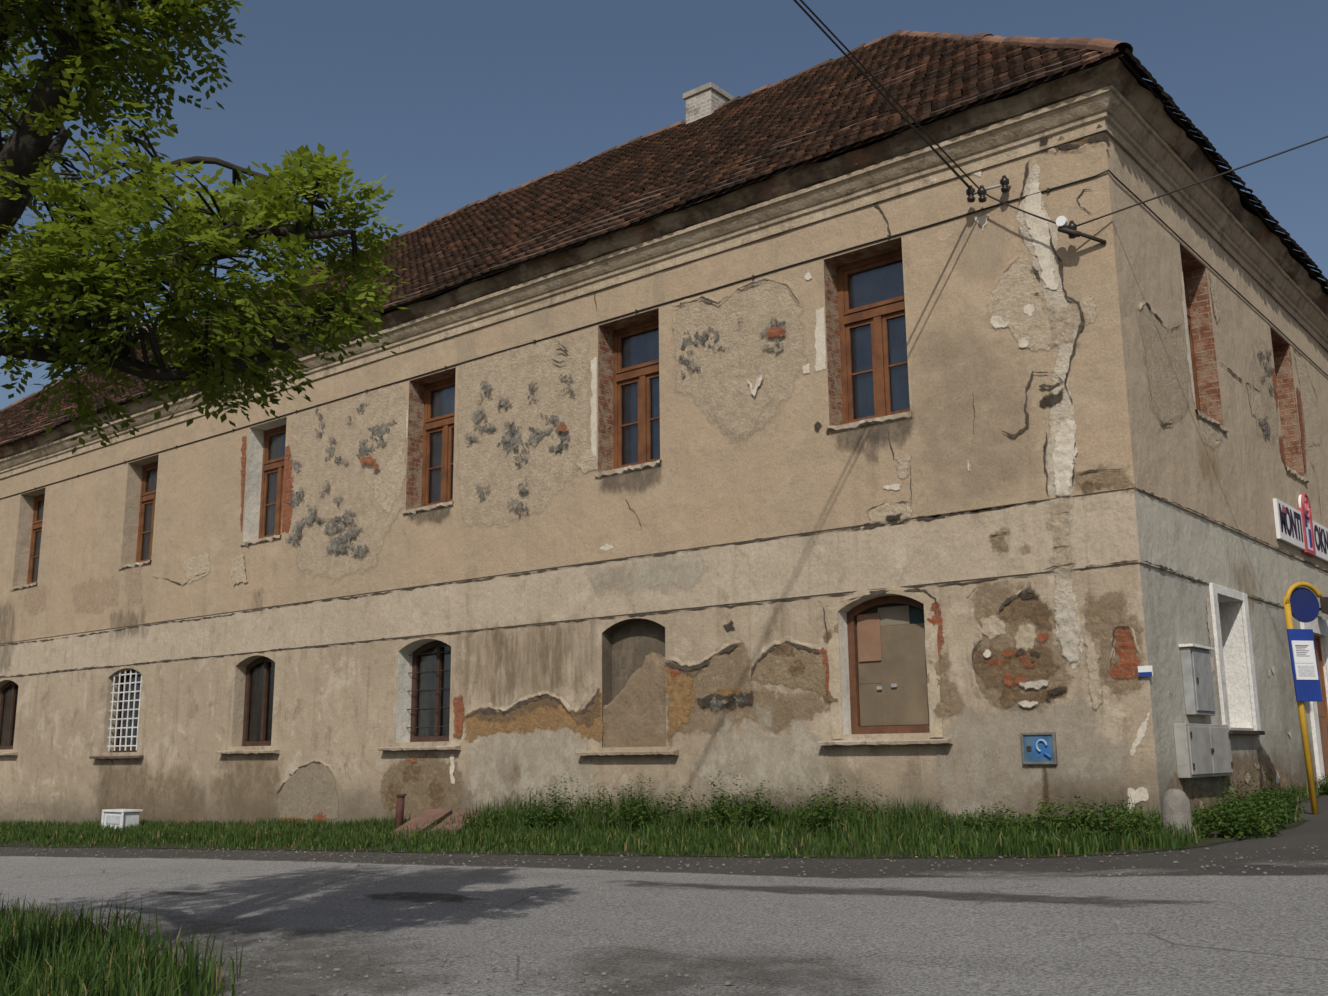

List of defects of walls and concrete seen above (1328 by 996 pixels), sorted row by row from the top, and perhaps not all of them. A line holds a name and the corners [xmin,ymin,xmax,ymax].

flaking render [230,436,249,586]
flaking render [281,384,408,583]
flaking render [456,336,597,527]
crack [0,160,1207,677]
flaking render [671,272,826,444]
flaking render [984,248,1056,352]
flaking render [1136,271,1223,451]
flaking render [1252,340,1287,466]
flaking render [1297,387,1307,473]
flaking render [663,581,1150,821]